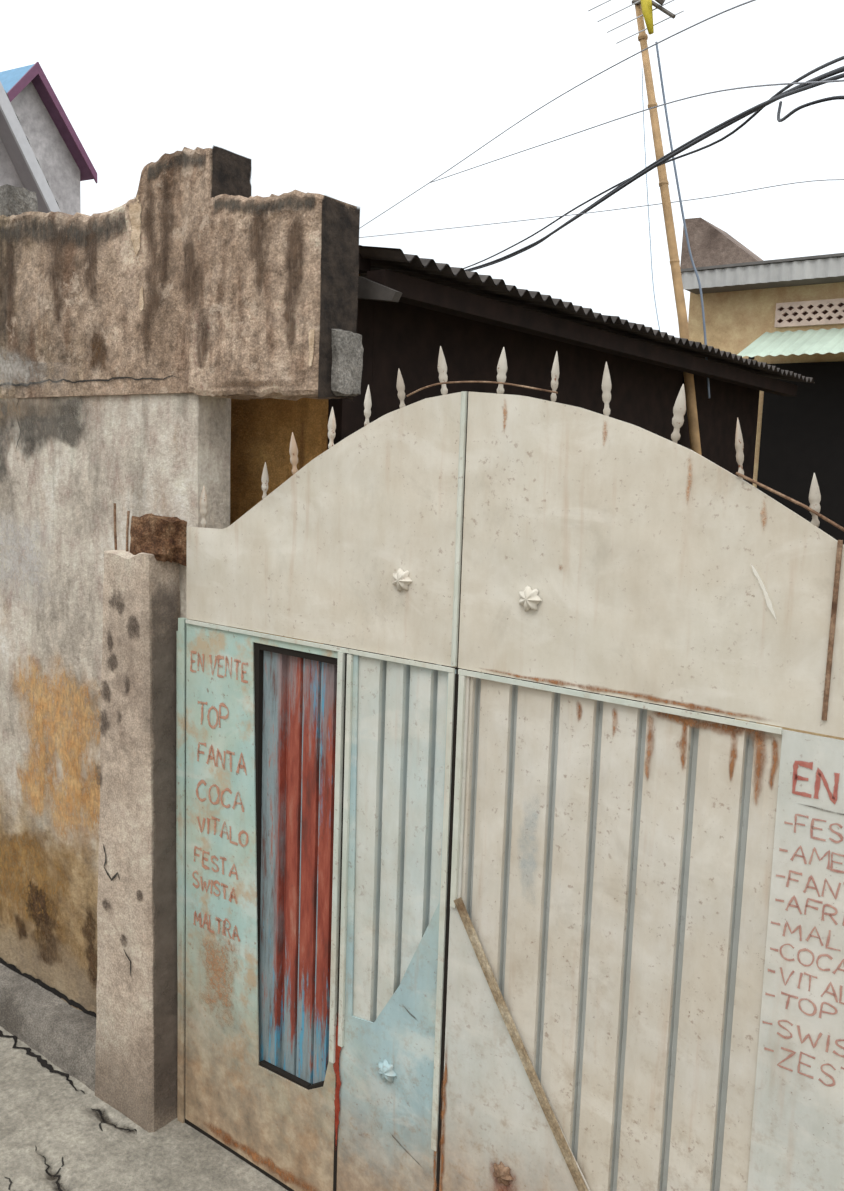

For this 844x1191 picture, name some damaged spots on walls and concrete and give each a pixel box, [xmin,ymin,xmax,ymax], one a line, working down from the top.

leakage [0,214,127,327]
leakage [143,145,360,400]
leakage [90,331,106,368]
crack [0,375,175,448]
spalling [113,503,187,566]
leakage [109,594,139,637]
leakage [99,632,121,734]
corrosion [490,670,778,802]
leakage [0,832,69,963]
leakage [79,900,110,983]
crack [0,1030,85,1094]
corrosion [210,1126,316,1191]